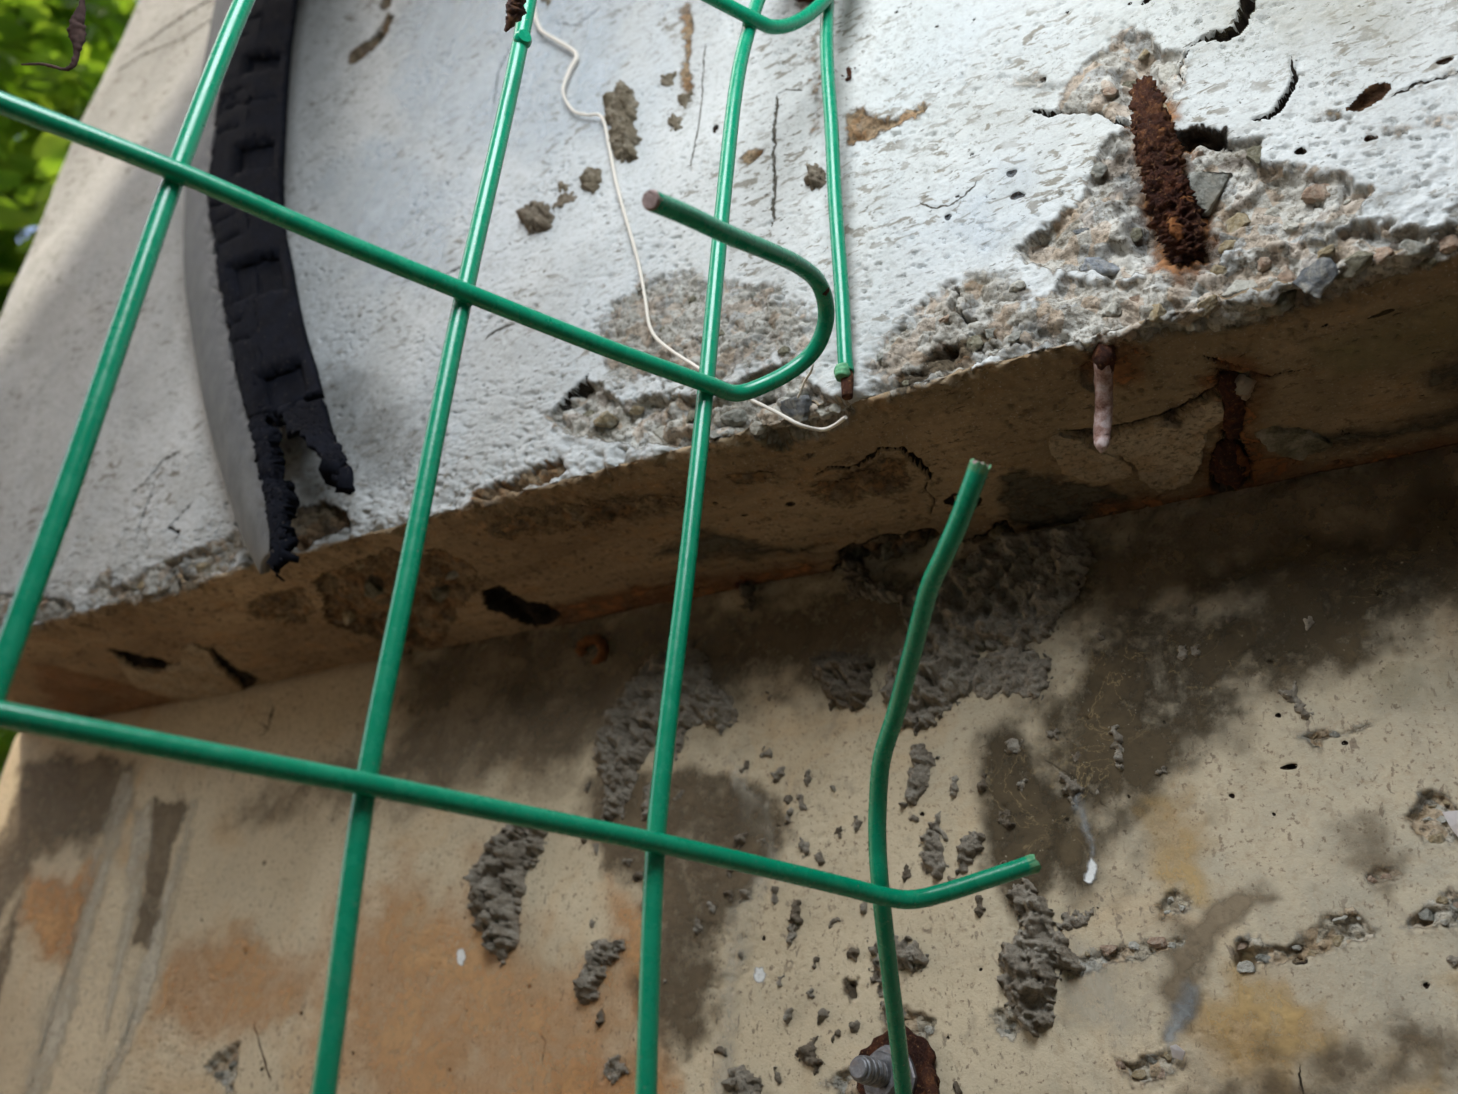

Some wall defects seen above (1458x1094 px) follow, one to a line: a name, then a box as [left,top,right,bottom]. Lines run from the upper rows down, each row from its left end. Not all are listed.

crack [1179,0,1256,81]
crack [1175,56,1299,154]
spalling [866,27,1458,397]
rust [1128,75,1217,284]
spalling [545,268,854,450]
rust [1209,368,1257,489]
damp [981,469,1458,908]
spalling [1405,791,1458,844]
damp [0,891,24,985]
damp [26,771,196,1094]
spalling [1235,906,1375,974]
spalling [205,1042,240,1094]